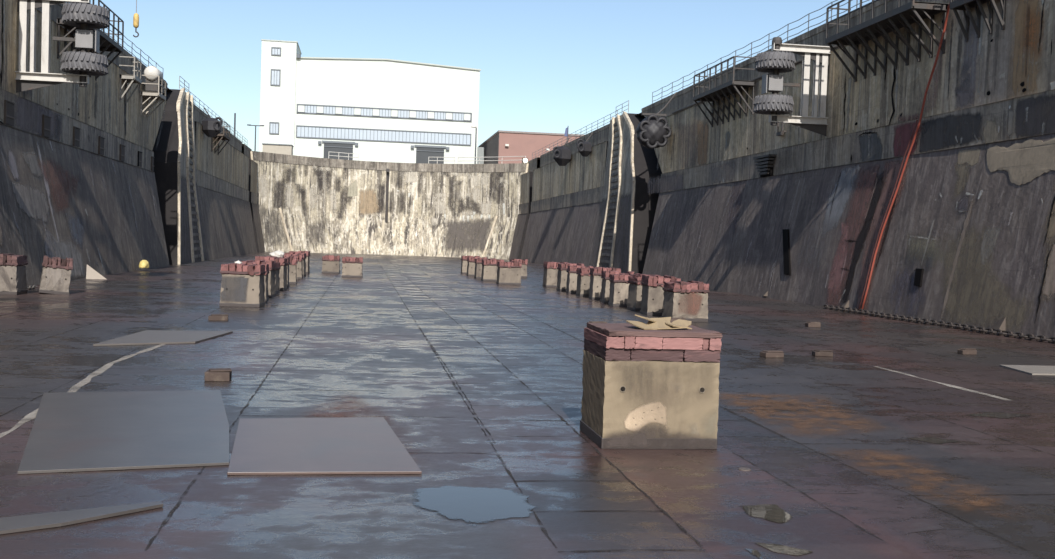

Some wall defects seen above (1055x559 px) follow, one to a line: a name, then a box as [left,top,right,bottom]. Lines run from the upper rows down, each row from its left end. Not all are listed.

peeling [1,150,49,231]
leakage [259,169,325,244]
leakage [316,168,352,218]
leakage [380,171,422,212]
leakage [444,172,505,251]
rust [828,161,908,310]
peeling [956,106,1055,212]
crack [1034,197,1055,323]
spalling [1043,202,1055,299]
peeling [625,403,667,431]